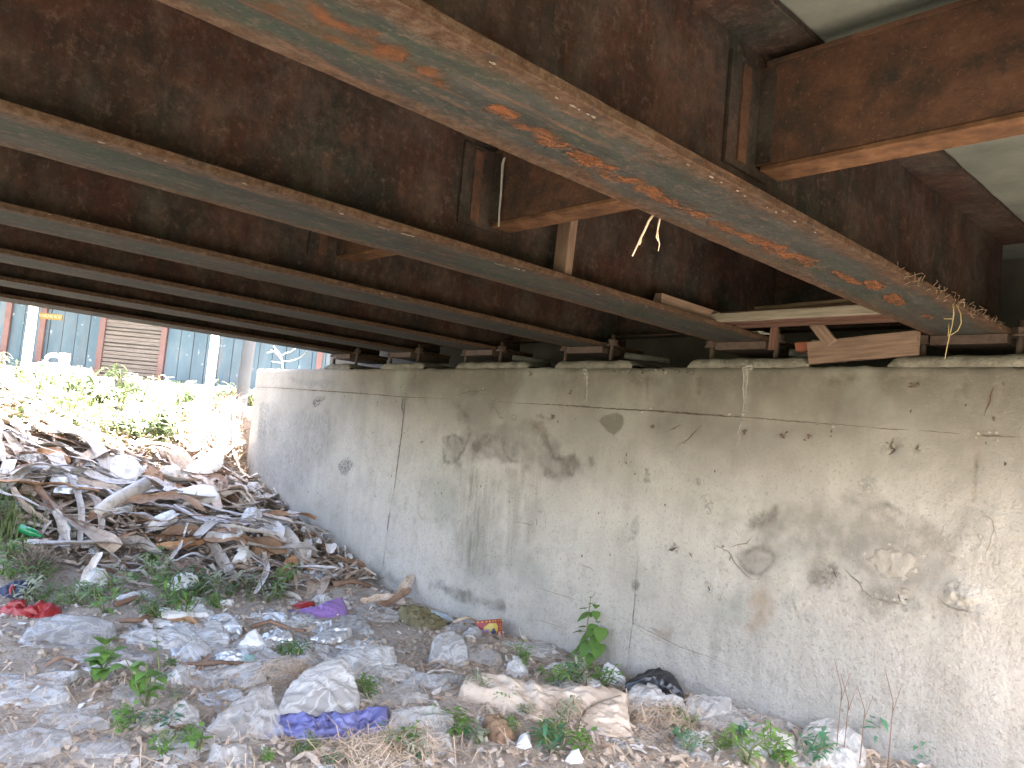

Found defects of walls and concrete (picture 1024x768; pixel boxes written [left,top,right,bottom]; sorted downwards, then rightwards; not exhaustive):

corrosion [486,104,816,267]
corrosion [833,270,907,305]
damp [600,414,623,434]
crack [265,379,1003,562]
crack [714,537,753,580]